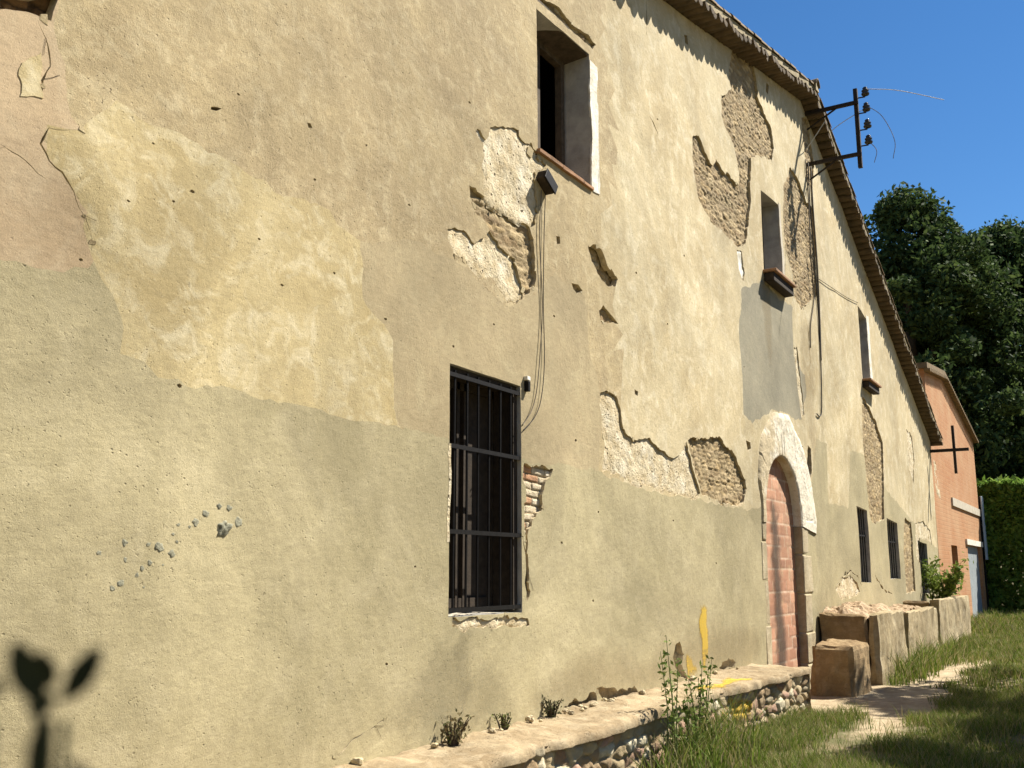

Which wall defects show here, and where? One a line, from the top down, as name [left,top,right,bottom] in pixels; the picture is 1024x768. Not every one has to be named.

flaking render [18,53,43,99]
spalling [692,50,773,277]
crack [82,214,96,244]
flaking render [447,127,544,304]
spalling [588,244,612,286]
spalling [783,118,815,309]
spalling [599,308,612,324]
flaking render [600,390,744,506]
spalling [862,398,884,523]
flaking render [523,465,550,542]
spalling [452,612,527,632]
flaking render [835,576,859,599]